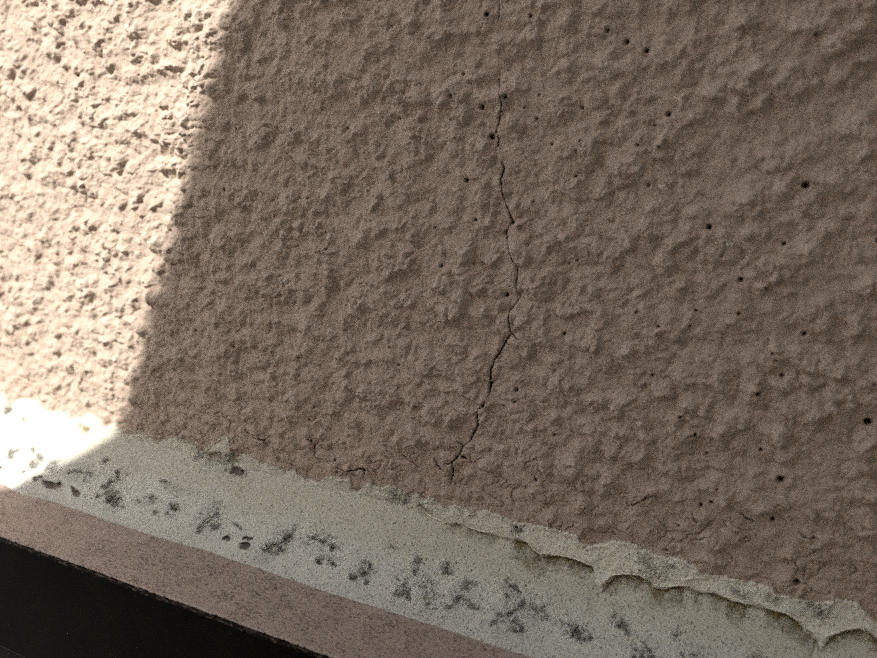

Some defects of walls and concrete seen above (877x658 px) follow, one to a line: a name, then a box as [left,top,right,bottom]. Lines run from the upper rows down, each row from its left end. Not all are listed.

crack [402,79,522,484]
leakage [514,539,594,572]
leakage [602,574,684,601]
leakage [711,594,748,616]
peeling [765,607,860,639]
leakage [766,609,877,654]